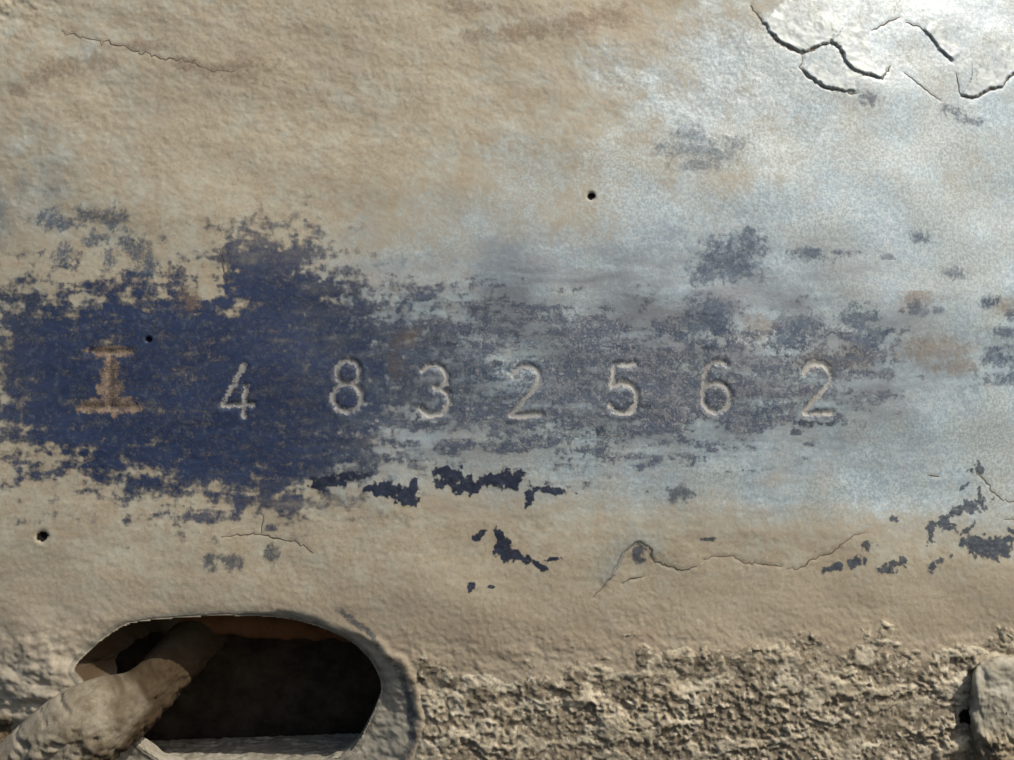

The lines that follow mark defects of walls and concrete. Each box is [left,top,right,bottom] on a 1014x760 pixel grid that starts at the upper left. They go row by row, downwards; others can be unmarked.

crack [62,31,236,73]
crack [750,5,1014,101]
peeling [0,207,905,530]
peeling [983,312,1014,385]
peeling [472,526,562,571]
crack [593,533,862,597]
peeling [822,540,907,574]
peeling [925,460,1014,573]
crack [975,469,1014,520]